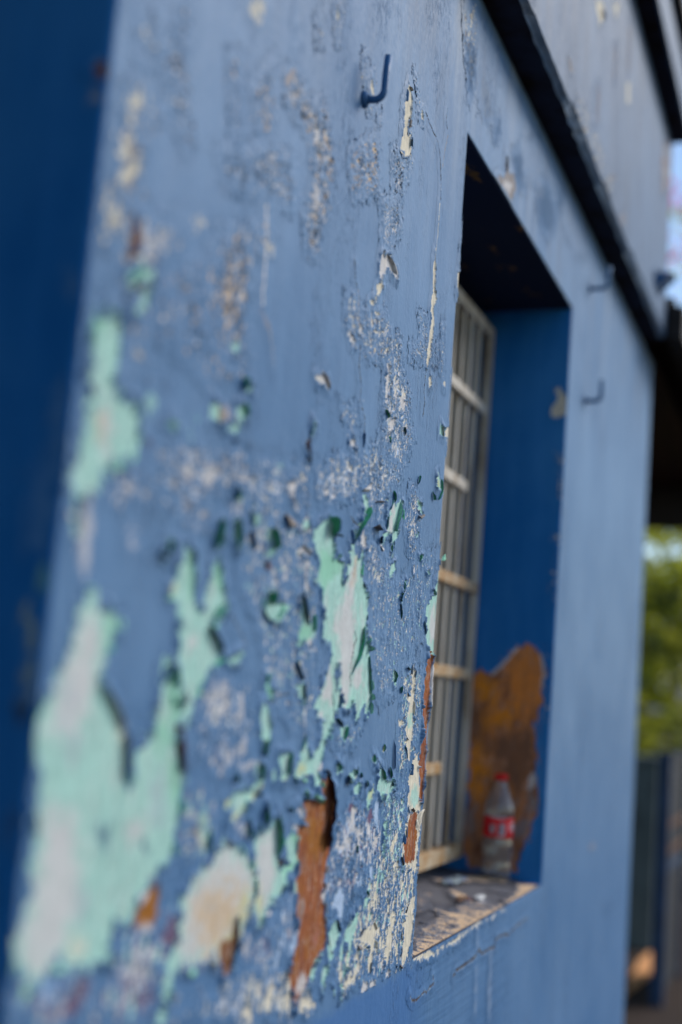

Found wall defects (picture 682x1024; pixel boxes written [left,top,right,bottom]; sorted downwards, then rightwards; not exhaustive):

peeling [240,0,272,39]
spalling [461,0,480,72]
peeling [551,442,564,513]
peeling [0,43,553,1024]
peeling [545,526,560,612]